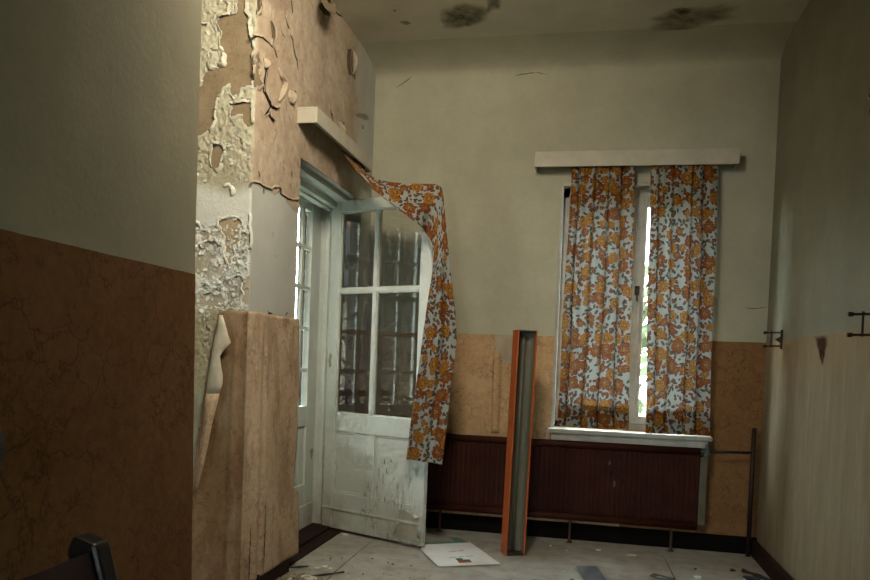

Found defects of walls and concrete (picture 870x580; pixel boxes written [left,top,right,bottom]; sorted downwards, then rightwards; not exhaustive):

spalling [197,0,297,197]
crack [252,0,298,123]
spalling [317,0,336,19]
peeling [347,49,358,75]
damp [446,0,499,27]
peeling [195,213,248,372]